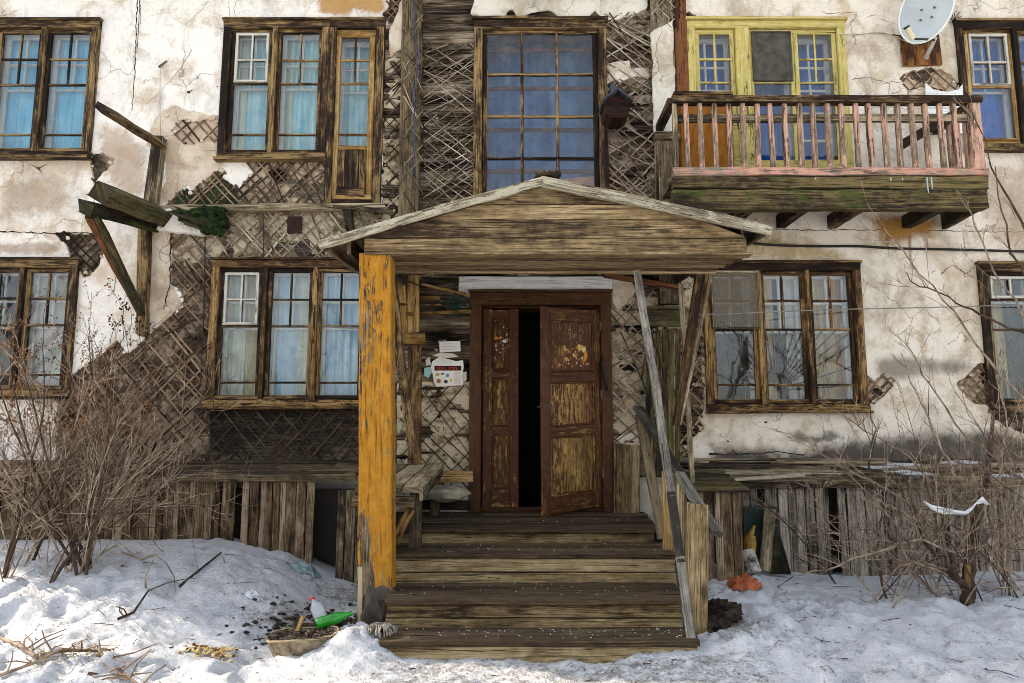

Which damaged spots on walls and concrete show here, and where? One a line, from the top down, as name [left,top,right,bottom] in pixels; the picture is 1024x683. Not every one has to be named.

crack [131,0,192,106]
peeling [146,106,224,204]
leakage [872,217,935,244]
peeling [149,232,185,332]